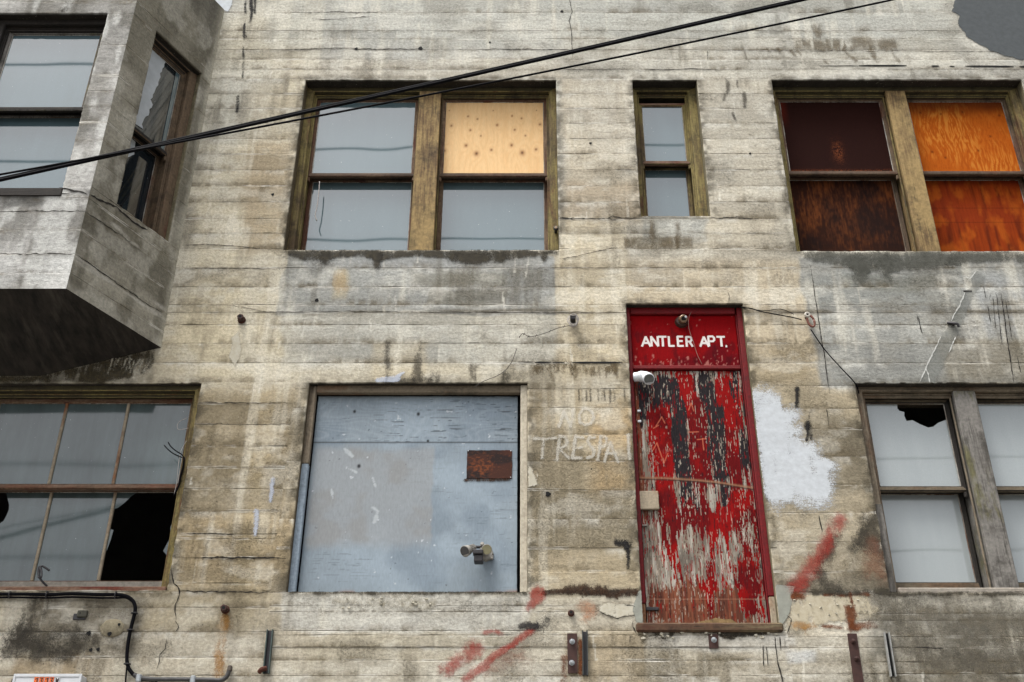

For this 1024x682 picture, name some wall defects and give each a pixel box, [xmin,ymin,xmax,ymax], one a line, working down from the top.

water stain [288,249,558,268]
water stain [803,251,1024,285]
mould [0,596,99,663]
crack [158,571,273,664]